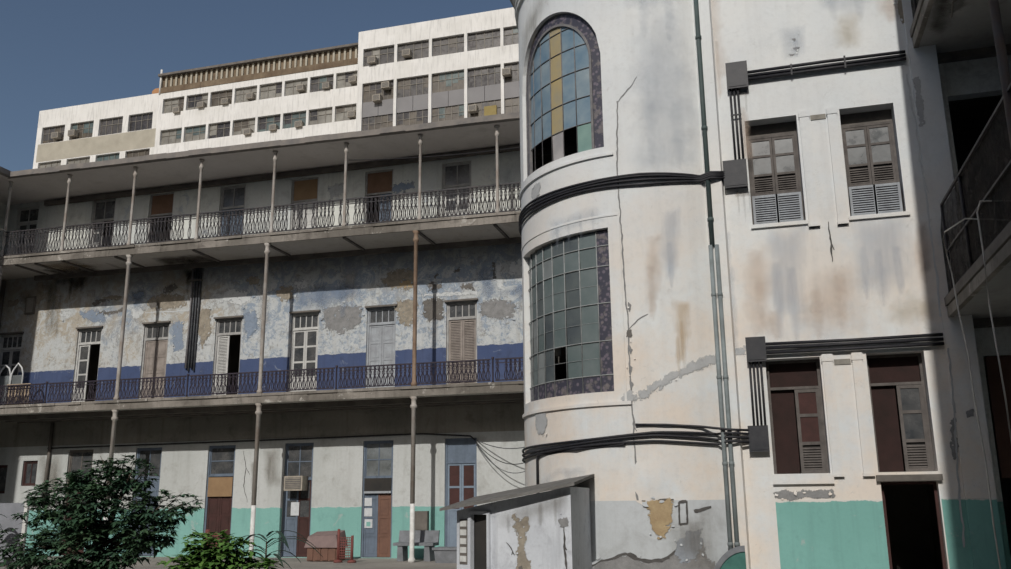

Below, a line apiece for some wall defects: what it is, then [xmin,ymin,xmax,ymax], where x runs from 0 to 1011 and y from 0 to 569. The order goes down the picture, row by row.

crack [827,222,835,262]
peeling [274,279,310,302]
peeling [381,258,522,327]
crack [616,76,648,464]
peeling [320,301,365,334]
flaking render [626,329,647,391]
flaking render [642,497,678,540]
flaking render [511,514,531,569]
flaking render [592,543,716,569]